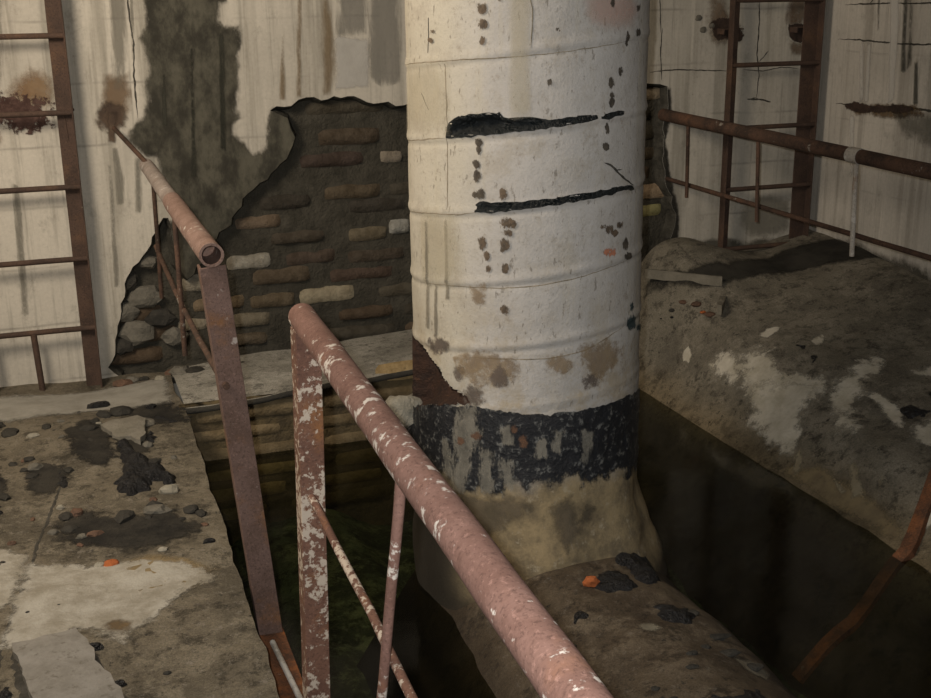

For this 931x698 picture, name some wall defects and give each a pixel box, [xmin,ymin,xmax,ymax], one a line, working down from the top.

corrosion [0,73,55,135]
corrosion [96,77,130,142]
leakage [111,0,295,240]
crack [421,18,634,214]
leakage [889,0,918,104]
spalling [601,83,676,263]
leakage [170,221,201,279]
spalling [215,96,470,413]
spalling [0,218,229,461]
spalling [246,393,295,455]
spalling [322,388,368,445]
leakage [536,432,562,458]